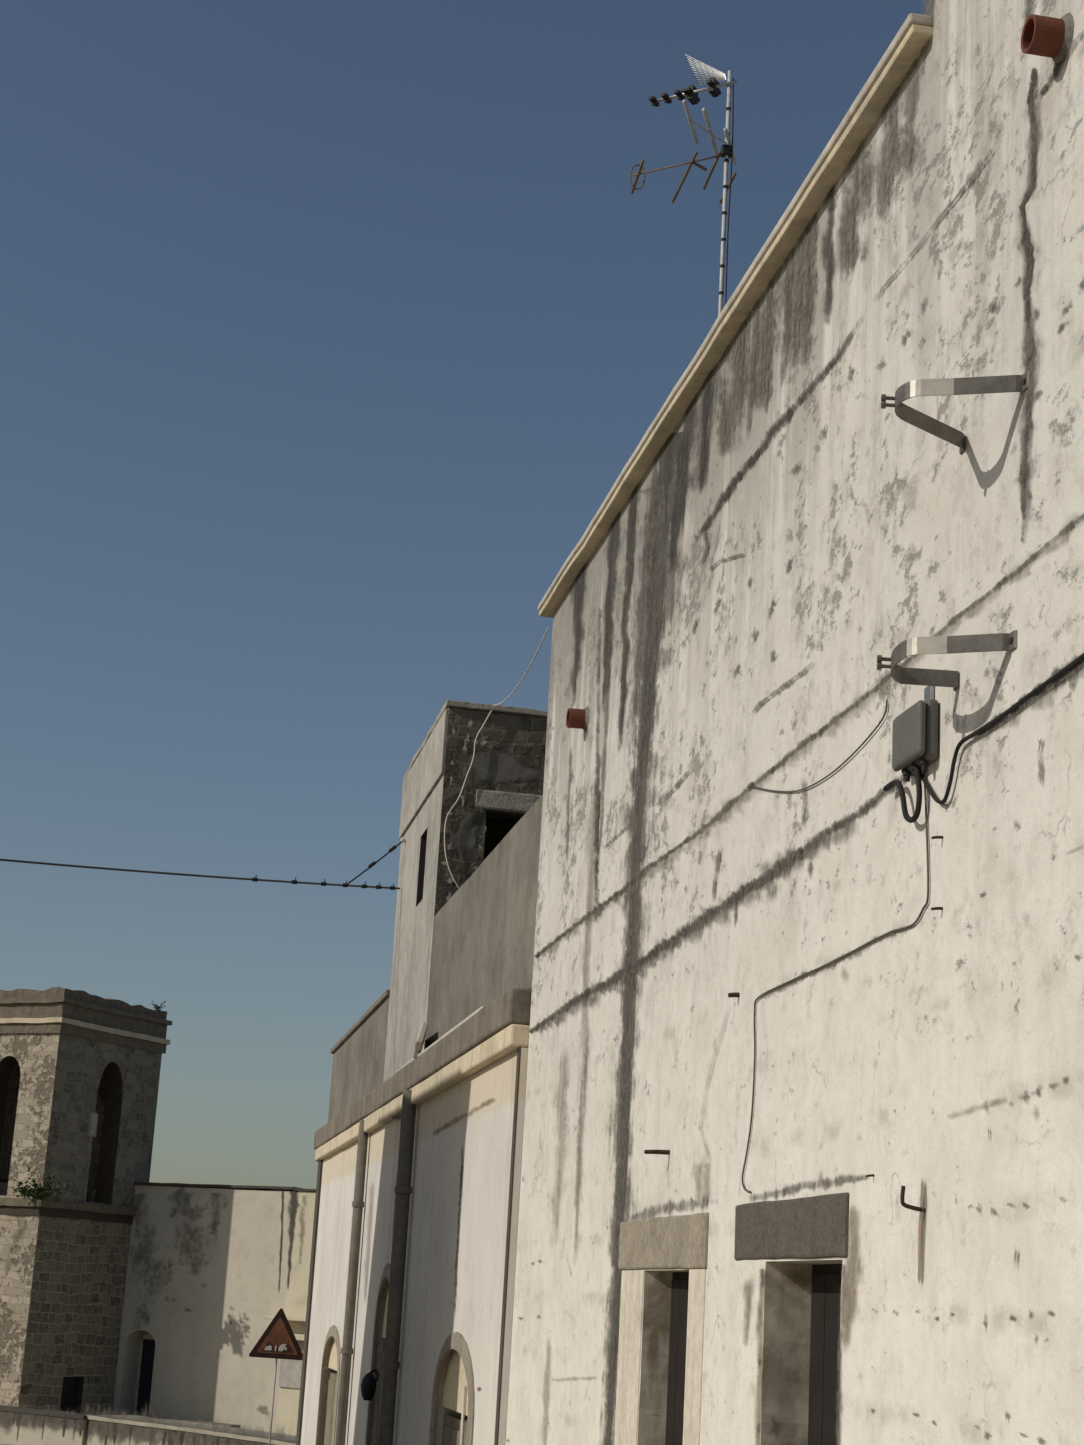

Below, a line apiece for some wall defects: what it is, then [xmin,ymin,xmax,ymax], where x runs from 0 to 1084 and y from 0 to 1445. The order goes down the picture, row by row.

water stain [571,563,586,700]
water stain [583,45,925,1445]
crack [529,40,1084,1033]